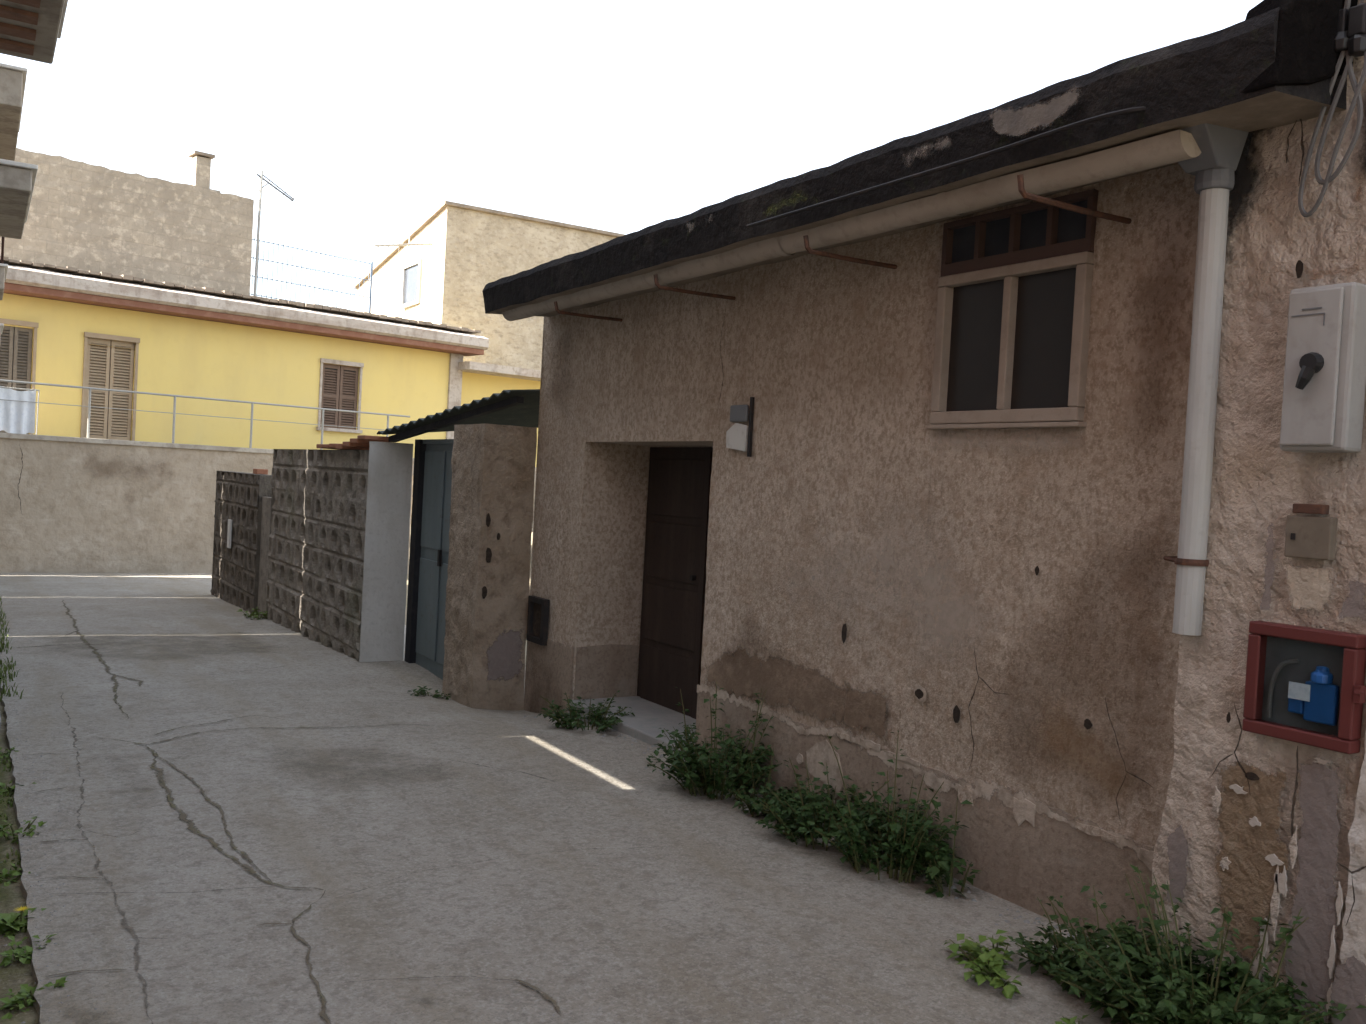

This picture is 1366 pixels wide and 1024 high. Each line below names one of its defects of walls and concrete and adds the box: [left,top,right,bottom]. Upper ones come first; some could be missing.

peeling [907,137,950,163]
peeling [989,88,1079,136]
crack [13,600,560,1024]
peeling [697,684,1154,871]
peeling [1211,757,1366,1024]